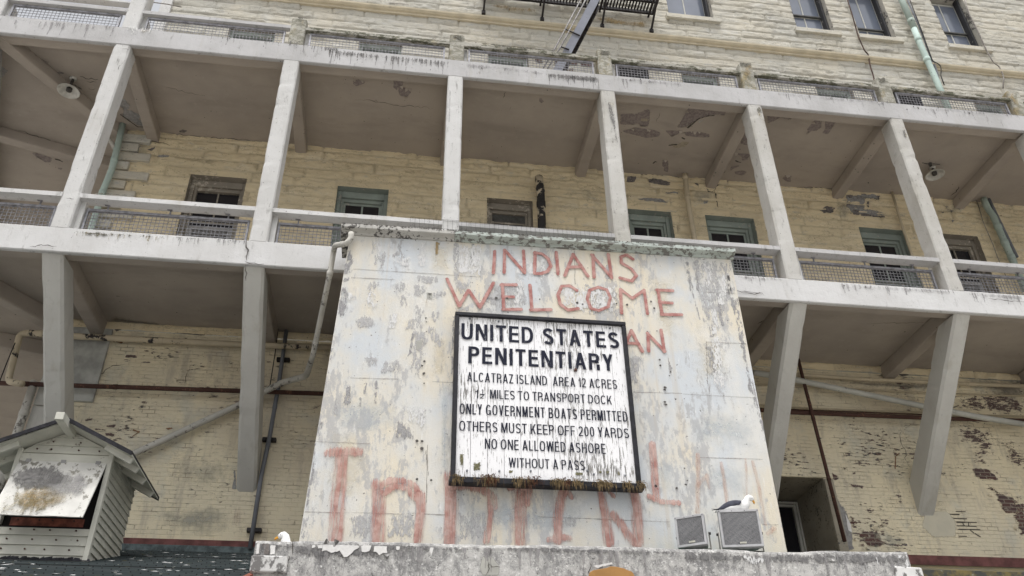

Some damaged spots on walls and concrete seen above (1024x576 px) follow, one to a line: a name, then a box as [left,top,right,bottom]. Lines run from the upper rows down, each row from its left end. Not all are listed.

damp [252,40,445,74]
damp [527,70,599,89]
peeling [620,108,725,138]
peeling [820,194,885,218]
peeling [960,393,1023,415]
peeling [959,426,1024,535]
peeling [256,543,282,555]